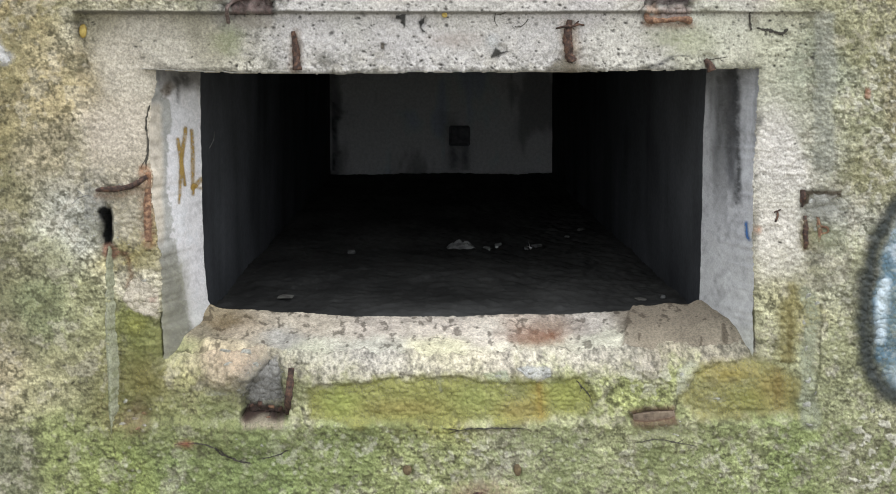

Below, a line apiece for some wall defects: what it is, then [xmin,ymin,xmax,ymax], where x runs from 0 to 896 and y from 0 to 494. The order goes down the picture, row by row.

spalling [231,0,273,25]
spalling [646,0,689,18]
water stain [725,76,740,203]
spalling [91,184,145,258]
corrosion [800,190,830,249]
spalling [237,357,294,429]